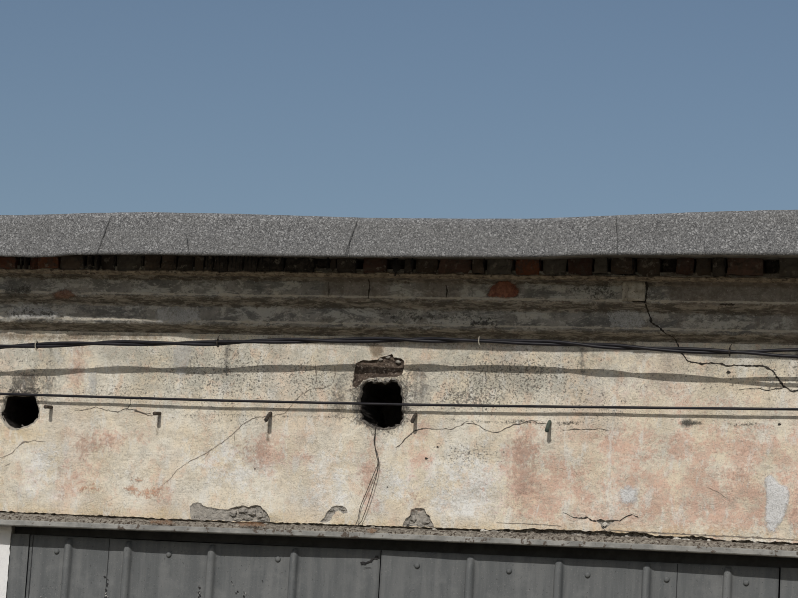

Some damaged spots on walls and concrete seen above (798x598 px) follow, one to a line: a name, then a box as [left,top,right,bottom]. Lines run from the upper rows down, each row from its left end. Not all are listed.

flaking render [487,281,519,298]
crack [620,258,798,392]
hole [0,393,40,430]
crack [165,365,336,483]
spalling [352,354,405,430]
crack [396,420,605,448]
spalling [0,502,798,545]
crack [496,512,794,540]
peeling [764,475,789,531]